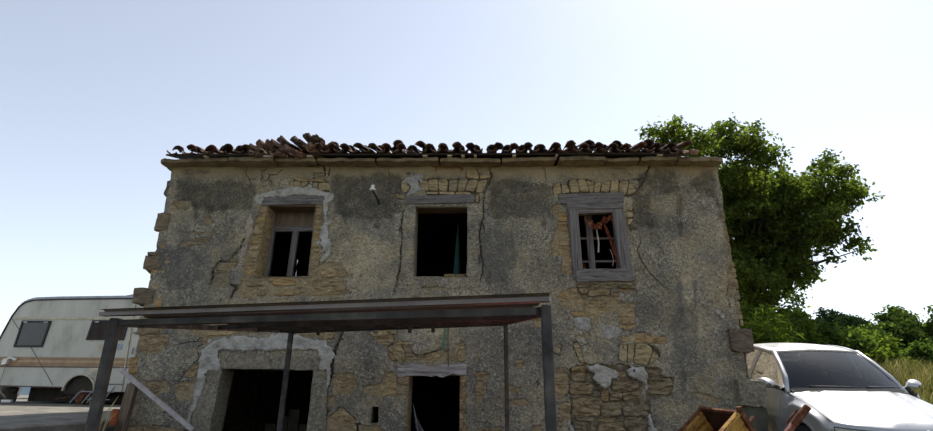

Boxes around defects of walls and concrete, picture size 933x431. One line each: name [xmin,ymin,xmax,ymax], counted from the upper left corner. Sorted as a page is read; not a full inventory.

crack [209,239,245,298]
spalling [236,167,352,299]
crack [394,212,404,291]
crack [478,171,493,281]
spalling [550,179,638,275]
flaking render [146,324,410,431]
spalling [369,330,465,363]
spalling [459,372,489,431]
spalling [554,285,673,431]